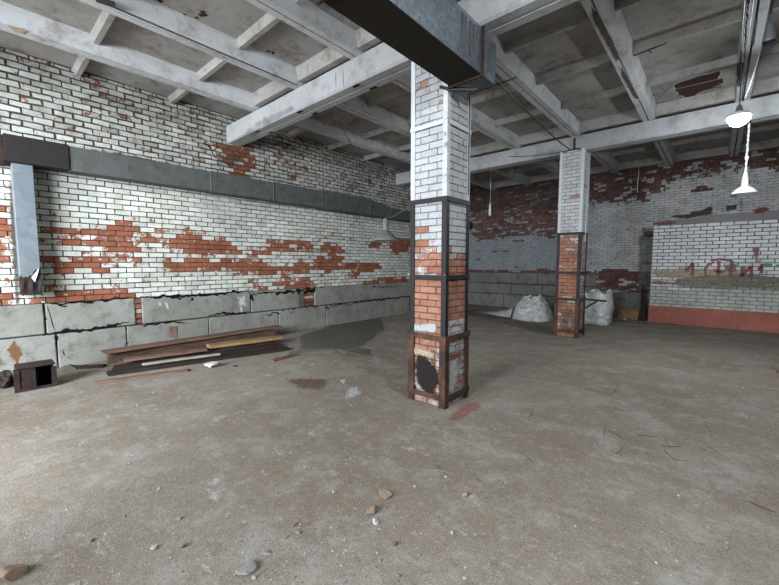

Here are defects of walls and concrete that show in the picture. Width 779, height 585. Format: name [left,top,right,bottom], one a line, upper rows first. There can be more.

spalling [673,61,746,98]
peeling [222,144,260,178]
peeling [590,147,779,204]
peeling [0,205,12,262]
peeling [40,220,141,274]
peeling [131,226,466,291]
peeling [471,179,650,293]
peeling [0,274,19,306]
crack [40,285,408,359]